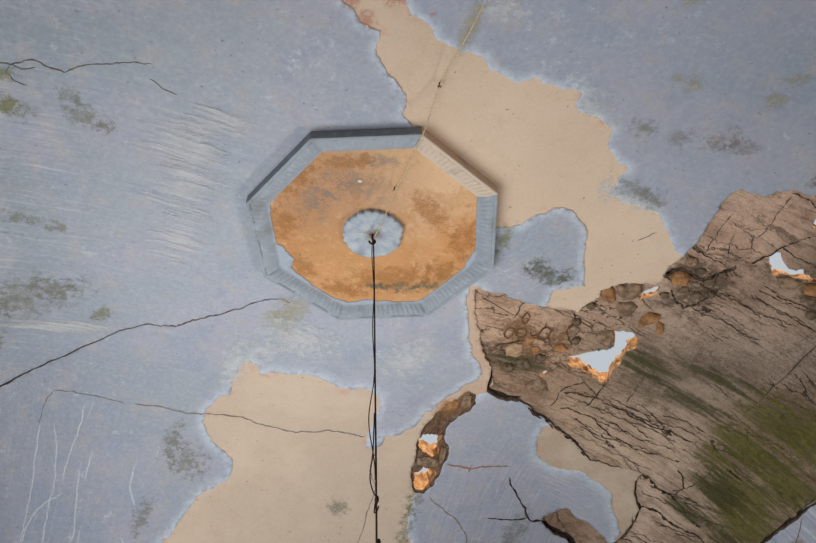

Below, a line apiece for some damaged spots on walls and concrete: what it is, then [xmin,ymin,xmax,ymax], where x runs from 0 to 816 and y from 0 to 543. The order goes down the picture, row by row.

crack [0,59,176,95]
water stain [0,96,21,113]
peeling [342,0,682,313]
water stain [526,261,572,285]
water stain [0,308,113,333]
crack [176,299,290,327]
spalling [163,189,816,543]
crack [39,390,365,437]
crack [358,454,375,542]
crack [430,498,467,543]
crack [447,464,576,543]
crack [620,474,642,538]